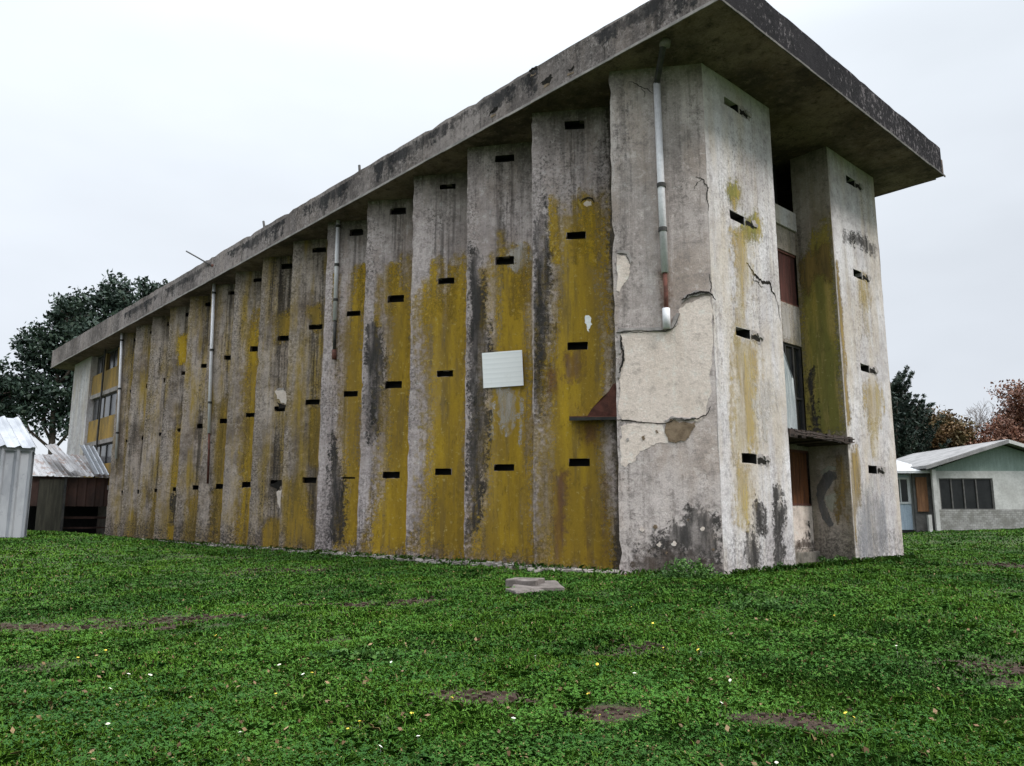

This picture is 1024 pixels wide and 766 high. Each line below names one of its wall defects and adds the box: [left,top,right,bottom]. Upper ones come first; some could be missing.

water stain [373,121,454,182]
crack [694,177,709,211]
spalling [275,388,287,409]
water stain [358,261,398,446]
water stain [421,106,615,539]
peeling [616,250,632,293]
peeling [617,290,713,467]
crack [618,274,716,373]
crack [746,262,780,317]
water stain [729,227,814,568]
water stain [308,405,349,547]
water stain [611,420,724,575]